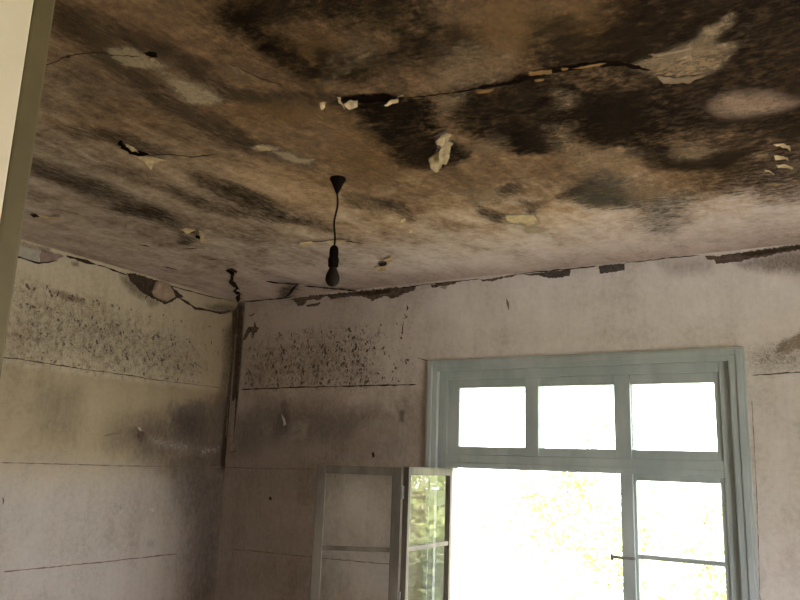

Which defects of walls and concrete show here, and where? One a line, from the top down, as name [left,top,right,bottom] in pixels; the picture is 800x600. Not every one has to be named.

peeling [636,15,737,84]
damp [59,0,800,233]
crack [320,62,650,110]
peeling [428,130,453,173]
peeling [754,143,793,187]
flaking render [18,243,235,314]
crack [183,248,243,302]
peeling [245,244,800,307]